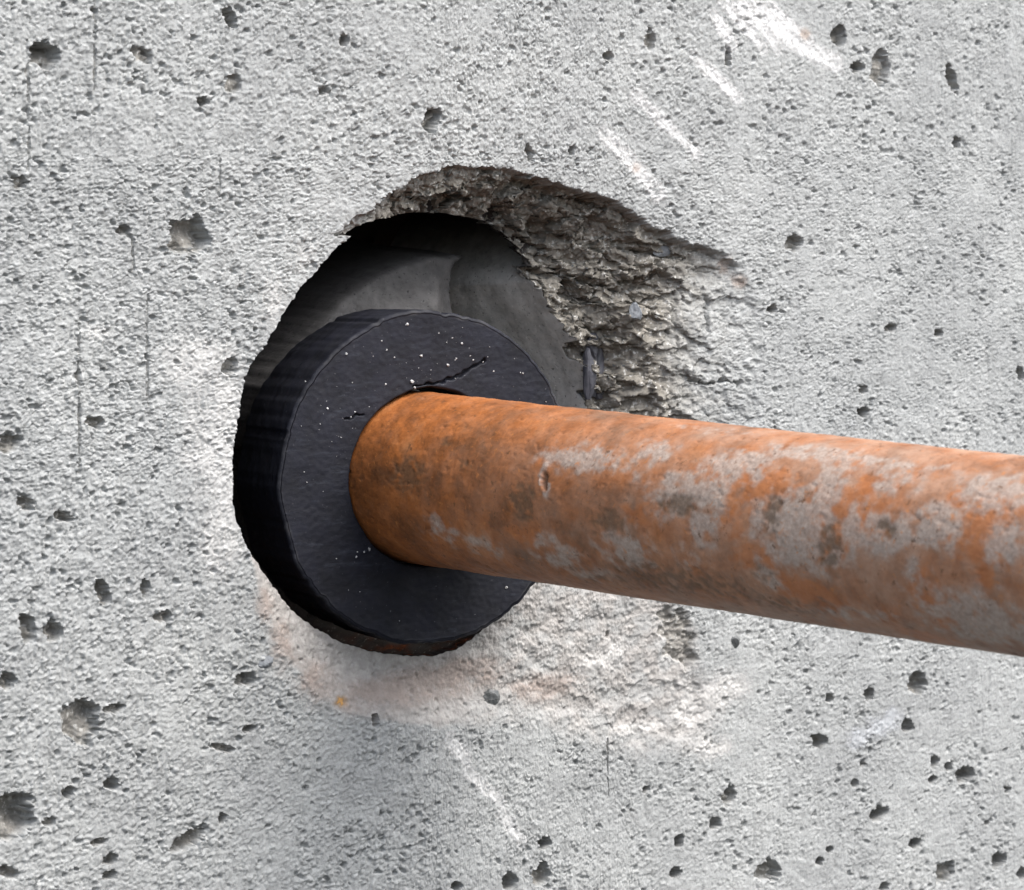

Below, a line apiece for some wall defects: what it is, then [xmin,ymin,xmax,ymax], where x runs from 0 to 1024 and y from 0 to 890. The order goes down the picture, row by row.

spalling [333,144,779,428]